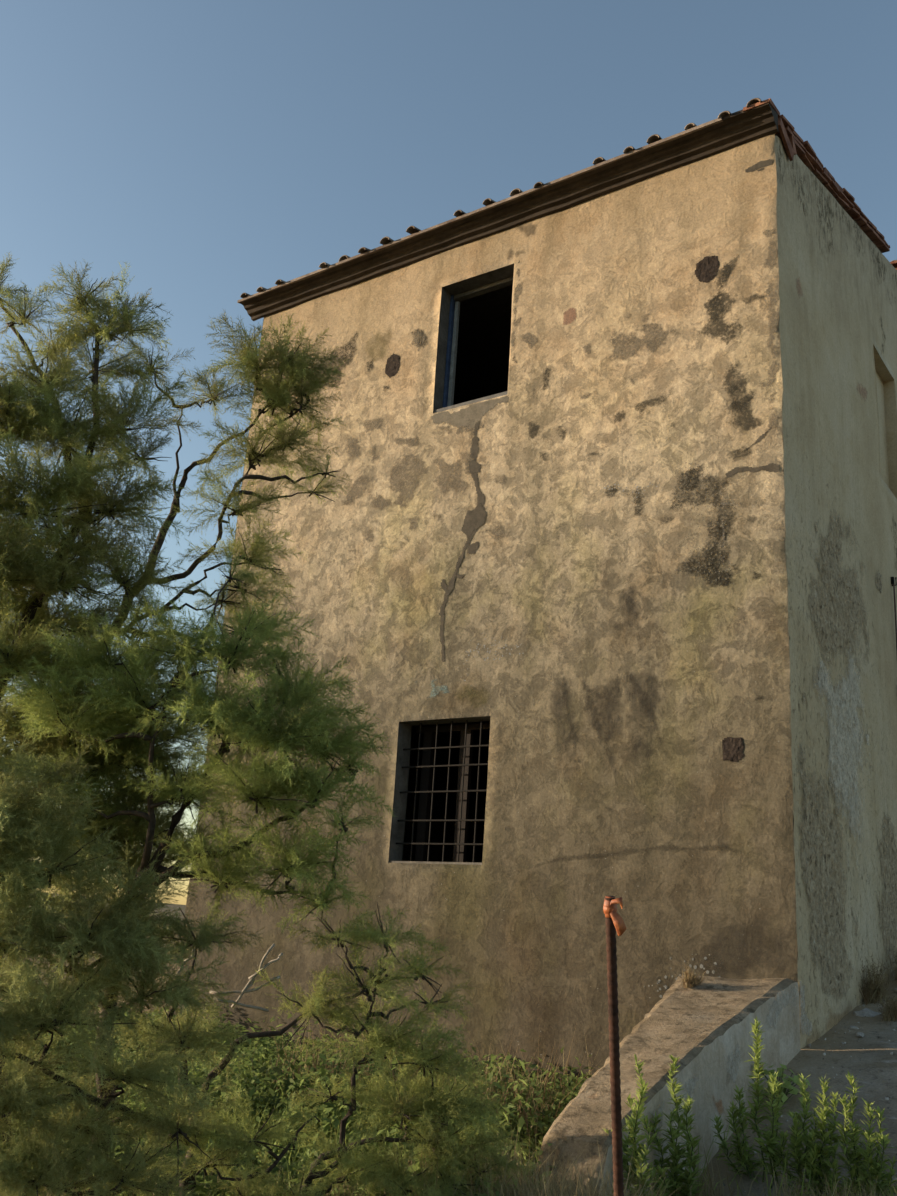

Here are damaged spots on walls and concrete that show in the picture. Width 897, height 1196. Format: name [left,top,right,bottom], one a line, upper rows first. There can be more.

spalling [695,256,719,283]
spalling [385,353,400,378]
crack [725,427,779,478]
crack [439,421,487,662]
spalling [809,515,869,667]
spalling [722,737,744,762]